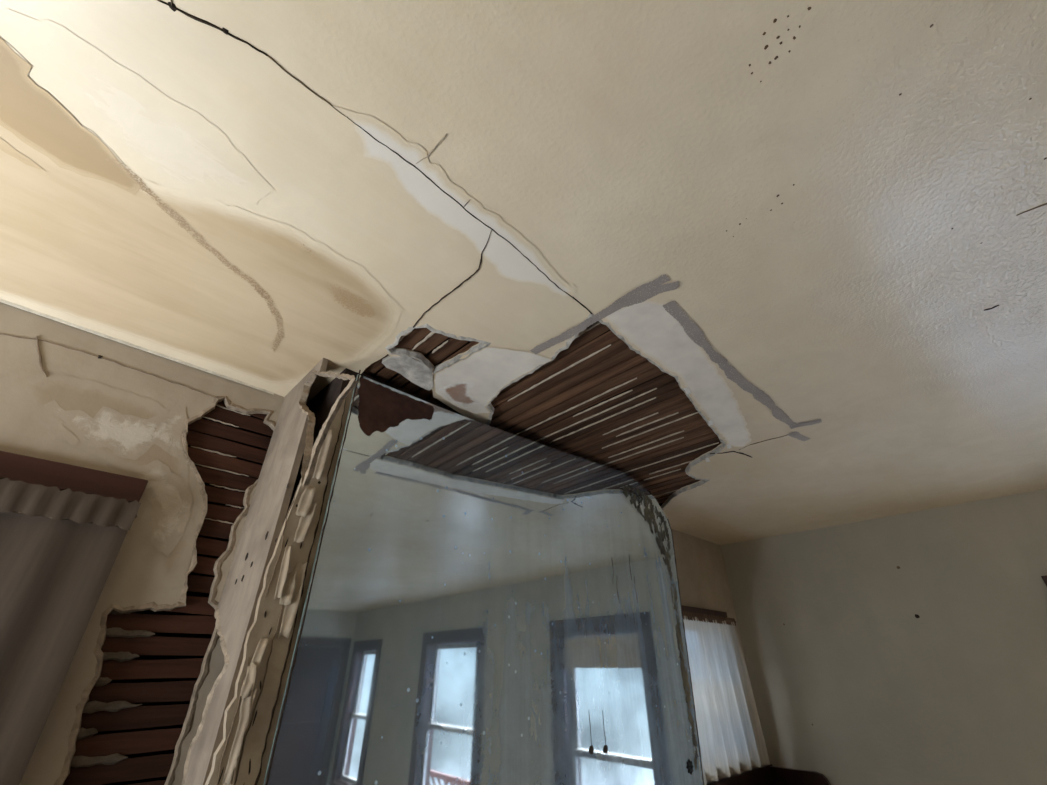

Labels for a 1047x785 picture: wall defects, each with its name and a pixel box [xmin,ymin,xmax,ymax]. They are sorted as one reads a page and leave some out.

water stain [0,38,404,385]
crack [157,0,592,328]
spalling [487,274,822,510]
spalling [44,396,276,785]